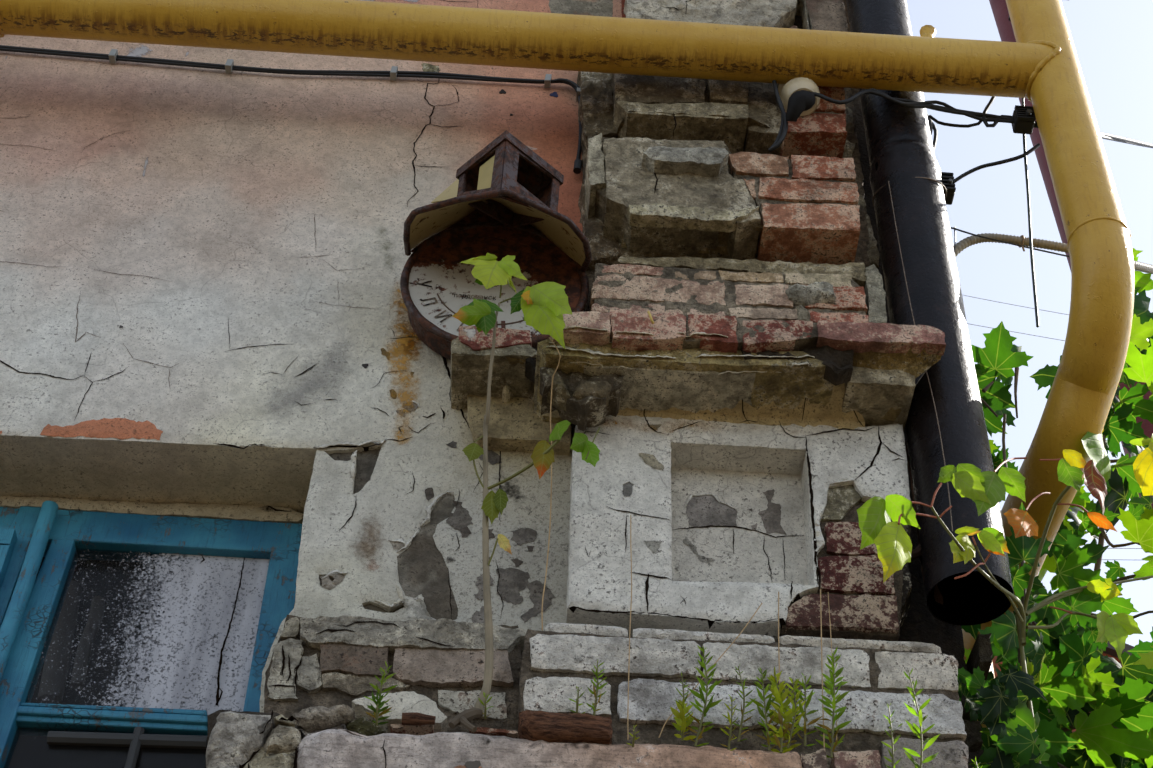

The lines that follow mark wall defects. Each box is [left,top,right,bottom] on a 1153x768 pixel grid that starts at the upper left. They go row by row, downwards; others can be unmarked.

peeling [549,0,613,17]
crack [407,67,459,207]
crack [0,269,184,418]
peeling [40,418,163,440]
flaking render [314,439,386,494]
peeling [479,450,502,465]
peeling [319,570,348,590]
flaking render [363,488,555,623]
peeling [683,489,787,562]
crack [569,398,904,629]